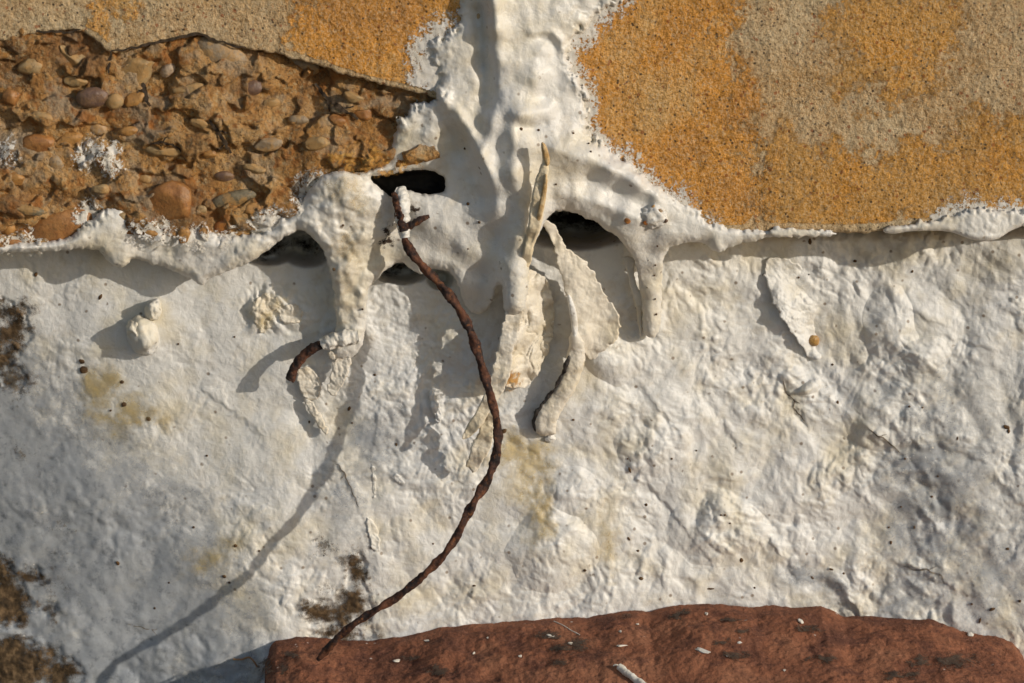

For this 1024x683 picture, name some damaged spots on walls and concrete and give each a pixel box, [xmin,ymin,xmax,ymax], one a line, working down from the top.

spalling [0,28,440,247]
leakage [0,340,253,683]